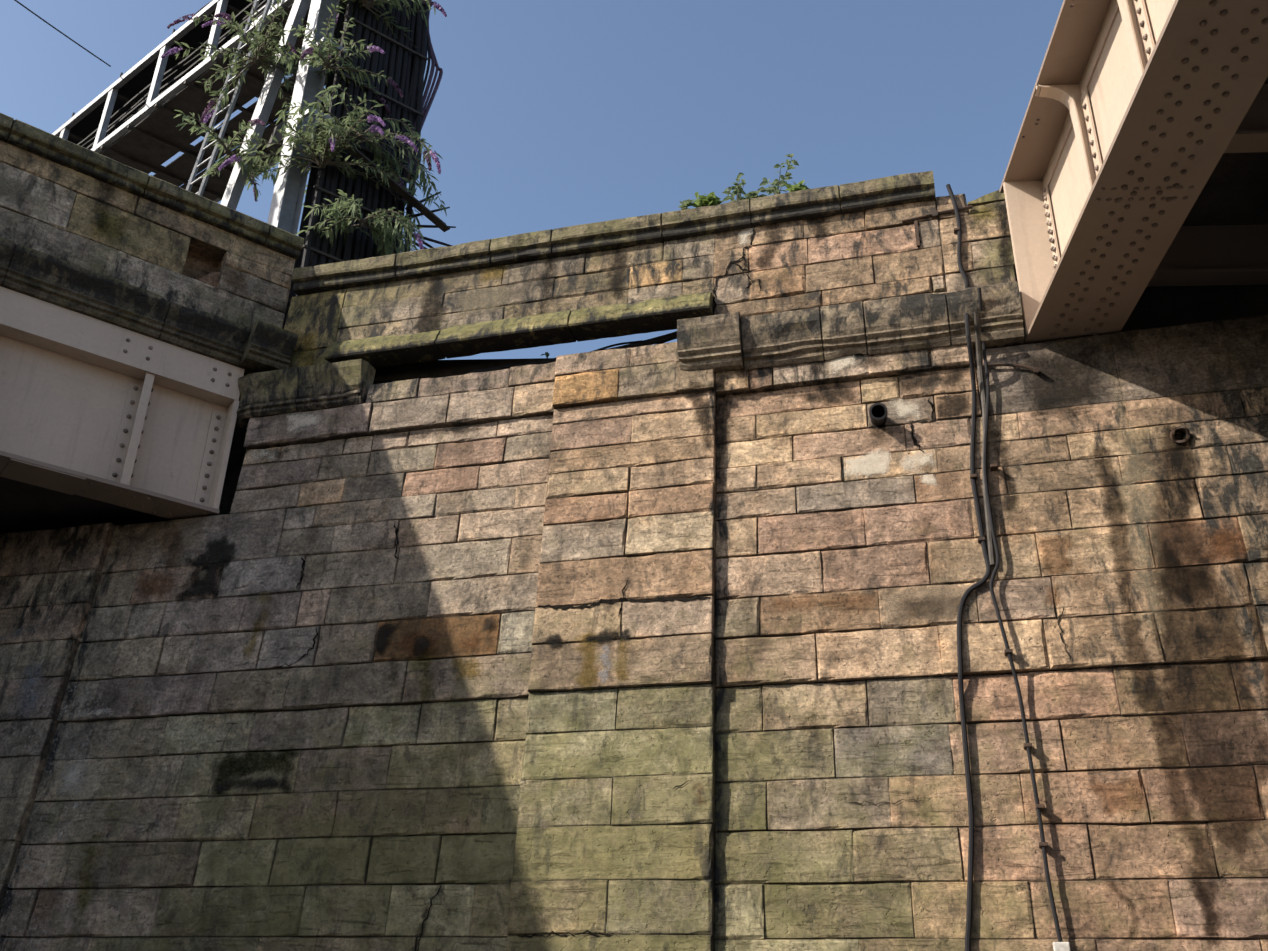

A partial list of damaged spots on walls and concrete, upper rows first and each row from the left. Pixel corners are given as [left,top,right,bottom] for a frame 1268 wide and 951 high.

crack [713,227,761,312]
leakage [1115,394,1172,626]
crack [538,580,711,618]